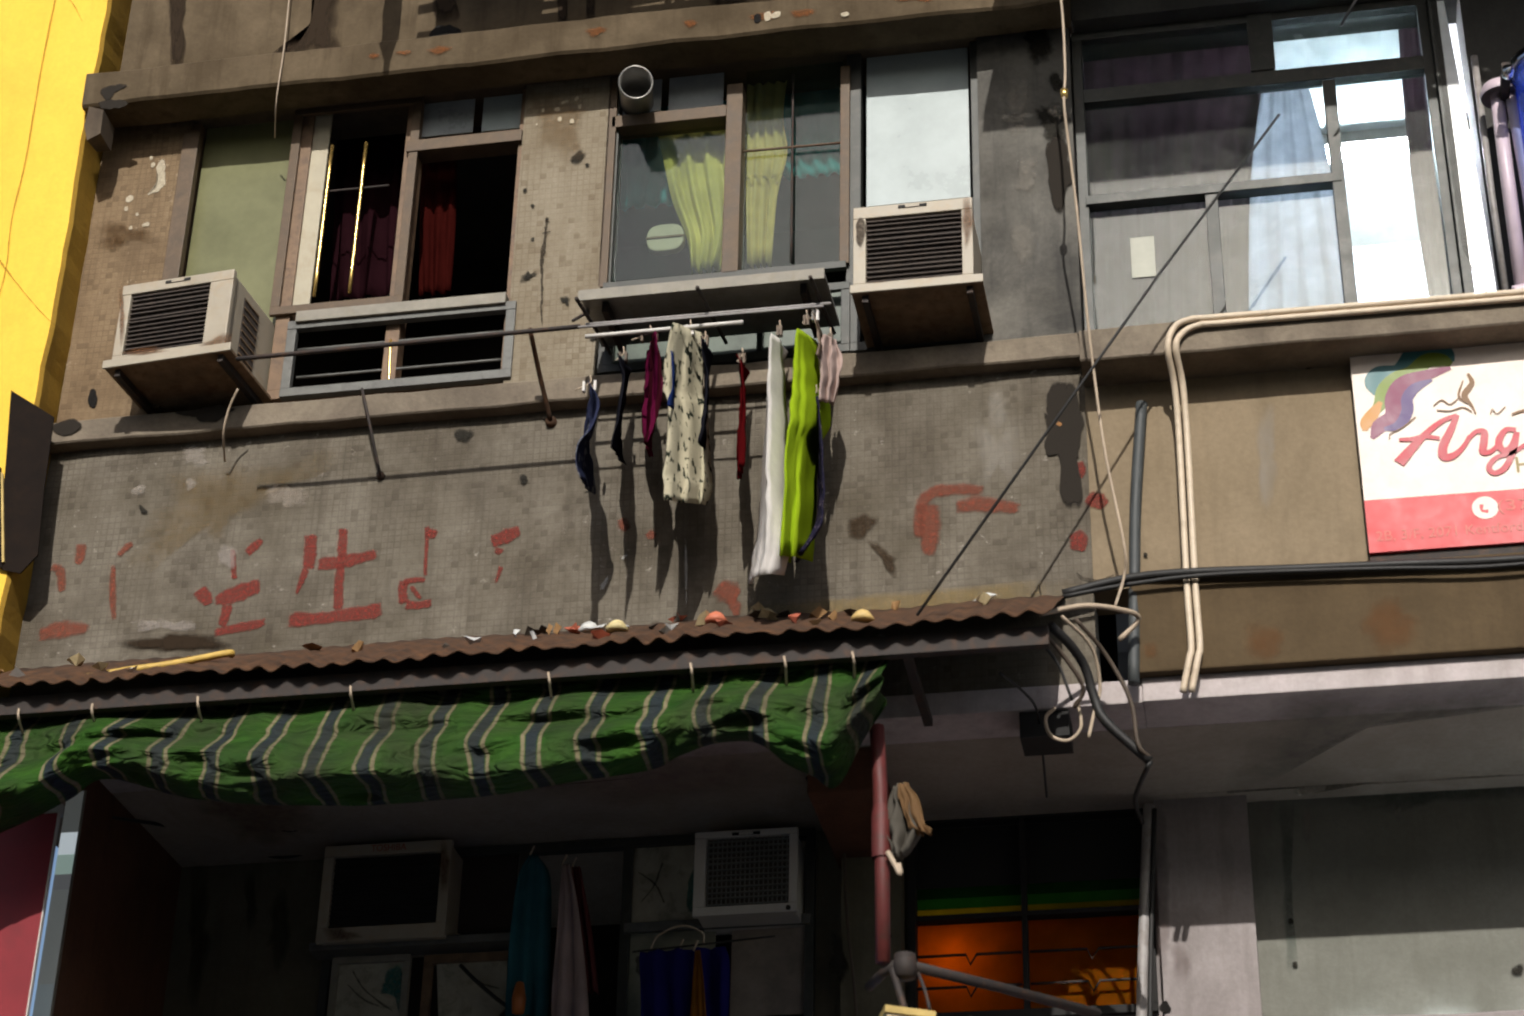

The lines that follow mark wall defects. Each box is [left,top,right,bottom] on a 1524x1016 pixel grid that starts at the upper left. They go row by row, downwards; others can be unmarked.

water stain [1024,29,1052,62]
water stain [1037,73,1070,139]
crack [0,0,82,319]